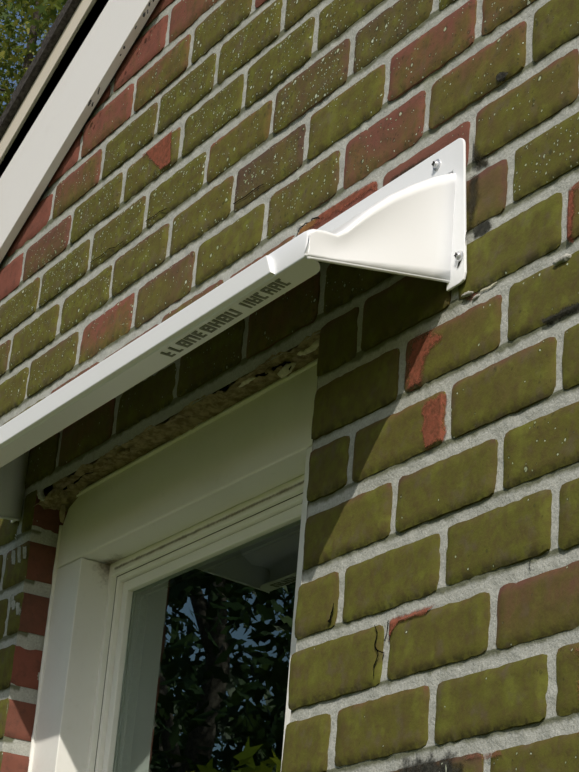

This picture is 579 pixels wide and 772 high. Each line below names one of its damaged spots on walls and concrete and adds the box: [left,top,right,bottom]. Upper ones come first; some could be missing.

spalling [33,330,321,523]
crack [373,620,389,677]
leakage [398,752,462,772]